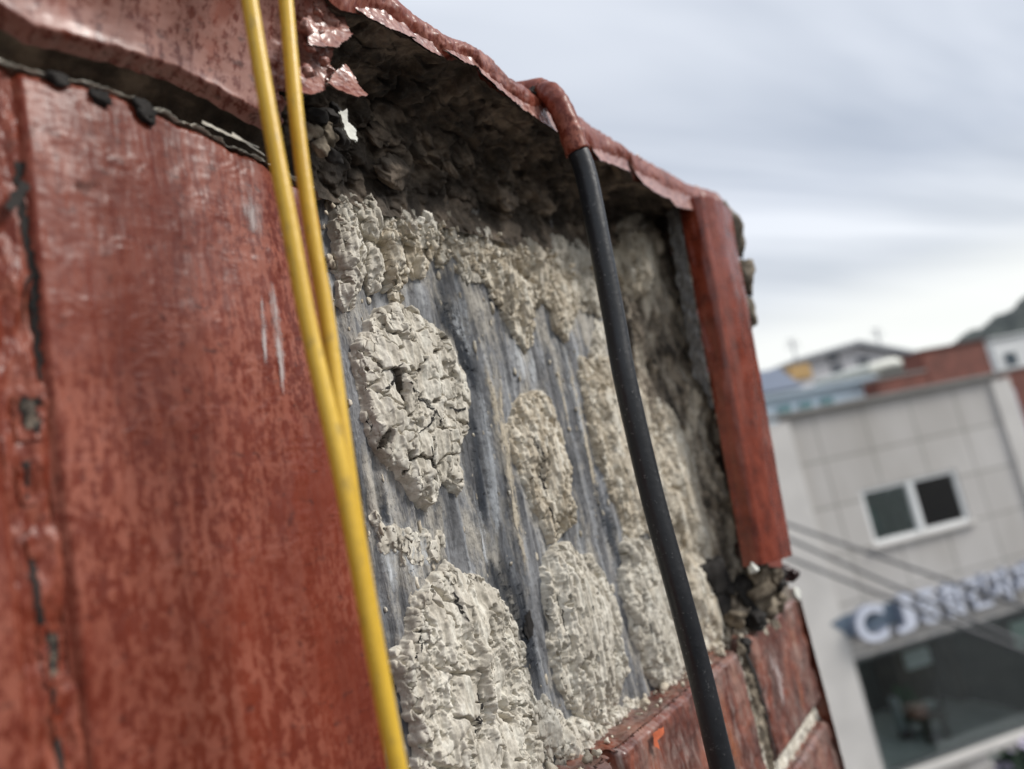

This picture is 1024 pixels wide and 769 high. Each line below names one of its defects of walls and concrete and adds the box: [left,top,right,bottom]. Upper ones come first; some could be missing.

peeling [296,2,411,192]
peeling [356,7,558,133]
peeling [591,149,700,210]
crack [359,307,469,481]
spalling [698,555,801,635]
peeling [653,727,664,749]